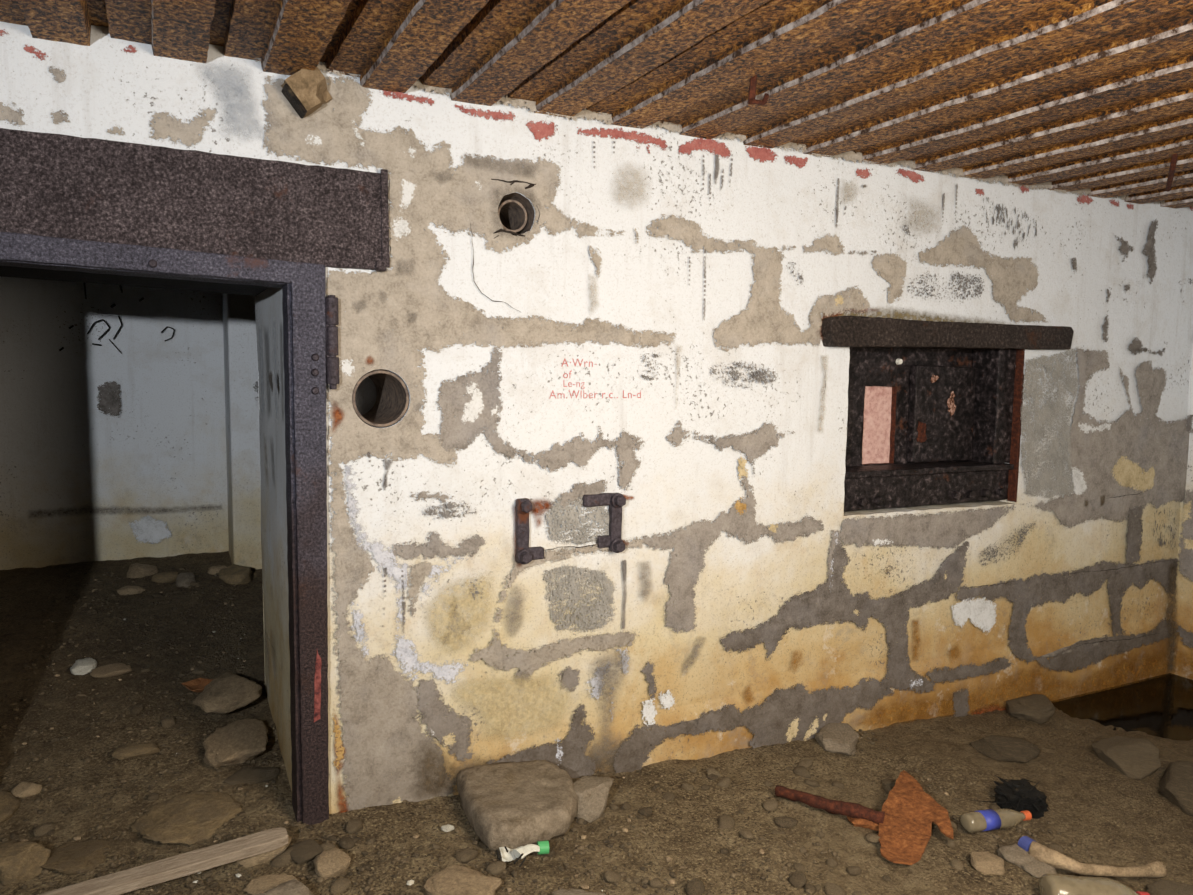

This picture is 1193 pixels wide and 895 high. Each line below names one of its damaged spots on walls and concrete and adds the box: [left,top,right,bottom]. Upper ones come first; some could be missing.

flaking render [262,62,1193,811]
corrosion [531,500,551,525]
leakage [344,465,566,735]
leakage [951,597,997,633]
leakage [1166,567,1178,670]
leakage [586,645,630,720]
leakage [641,690,675,726]
leakage [421,750,486,794]